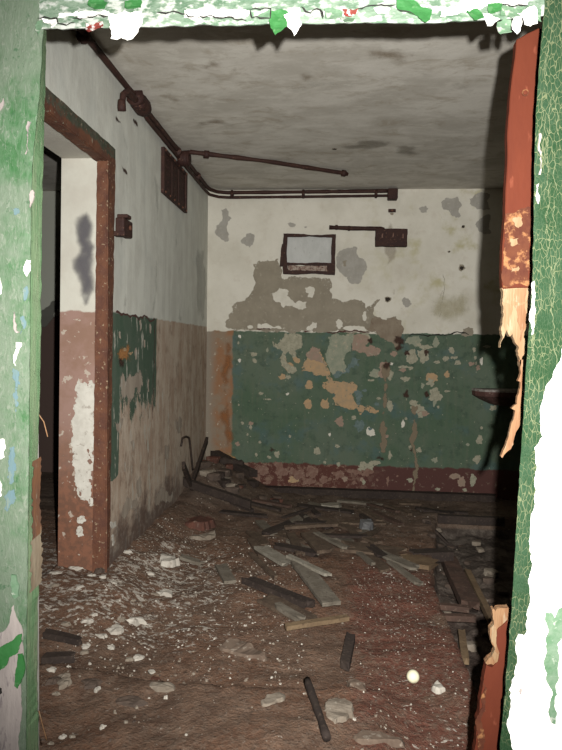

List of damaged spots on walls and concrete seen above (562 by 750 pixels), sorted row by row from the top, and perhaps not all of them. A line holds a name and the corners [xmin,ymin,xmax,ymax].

peeling [35,0,143,40]
peeling [184,6,302,36]
peeling [374,0,542,34]
spalling [441,192,491,234]
spalling [336,246,367,284]
peeling [501,184,540,334]
spalling [225,259,491,436]
peeling [71,378,95,506]
peeling [0,439,17,511]
peeling [253,447,413,486]
peeling [29,457,43,593]
peeling [76,516,86,537]